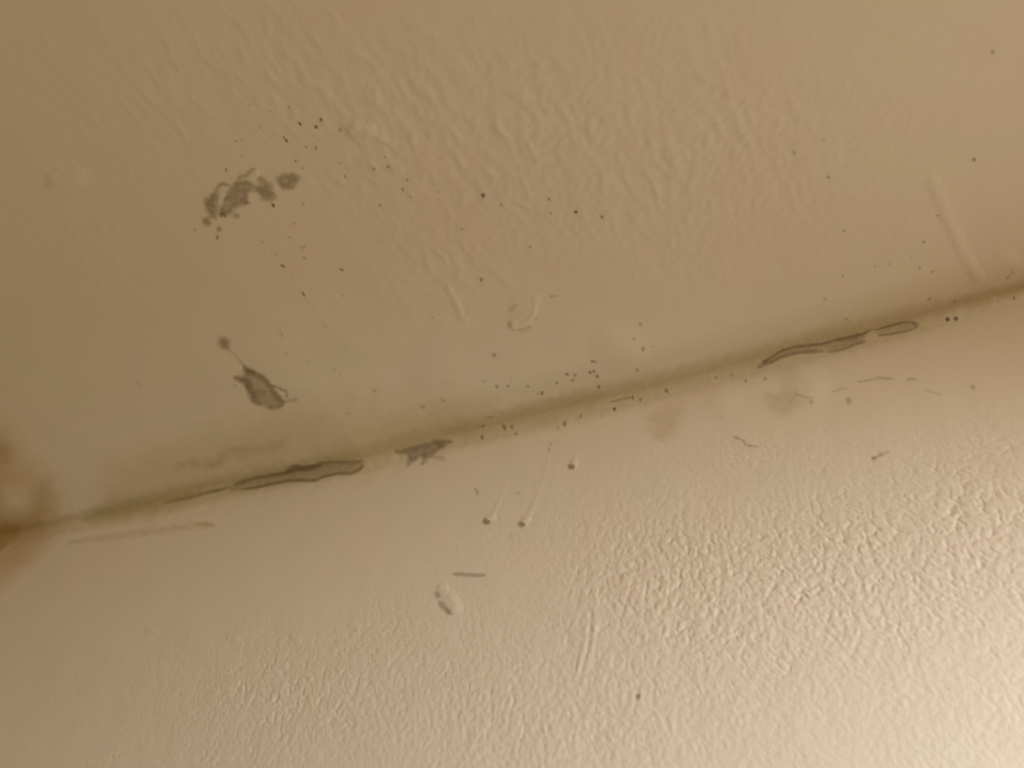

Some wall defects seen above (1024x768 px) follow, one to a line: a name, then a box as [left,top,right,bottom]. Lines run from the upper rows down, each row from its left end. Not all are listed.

crack [277,465,320,474]